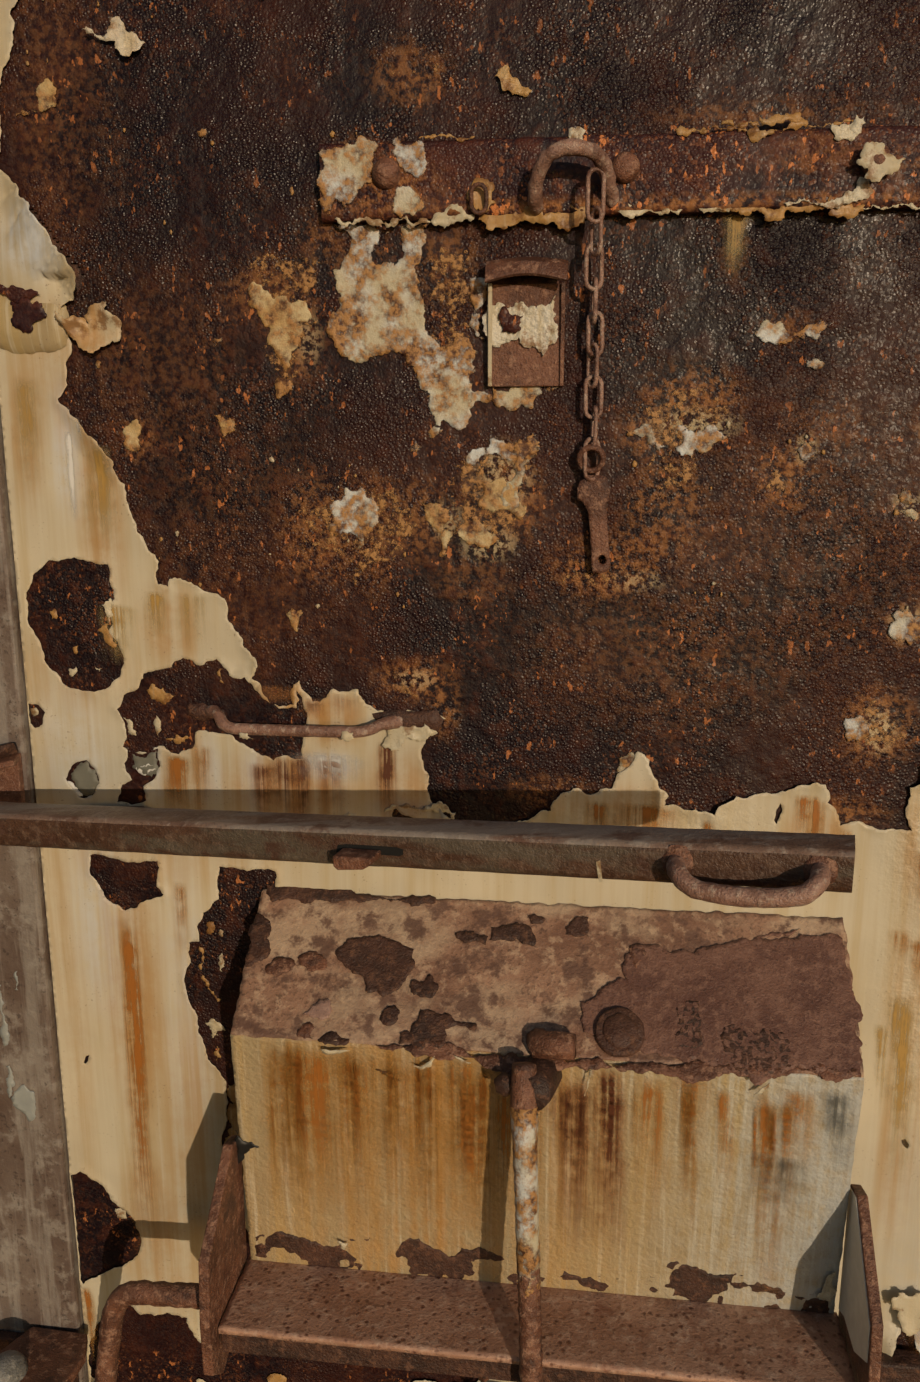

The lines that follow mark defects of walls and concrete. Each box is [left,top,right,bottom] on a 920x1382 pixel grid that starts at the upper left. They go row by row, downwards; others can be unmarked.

corrosion [0,284,47,333]
corrosion [498,306,523,334]
peeling [0,0,920,831]
corrosion [380,747,393,797]
peeling [455,914,545,946]
corrosion [122,930,148,1183]
peeling [184,867,529,1146]
corrosion [386,1060,511,1187]
corrosion [560,1074,663,1195]
peeling [72,1172,141,1284]
peeling [89,1315,102,1378]
peeling [117,1306,479,1382]